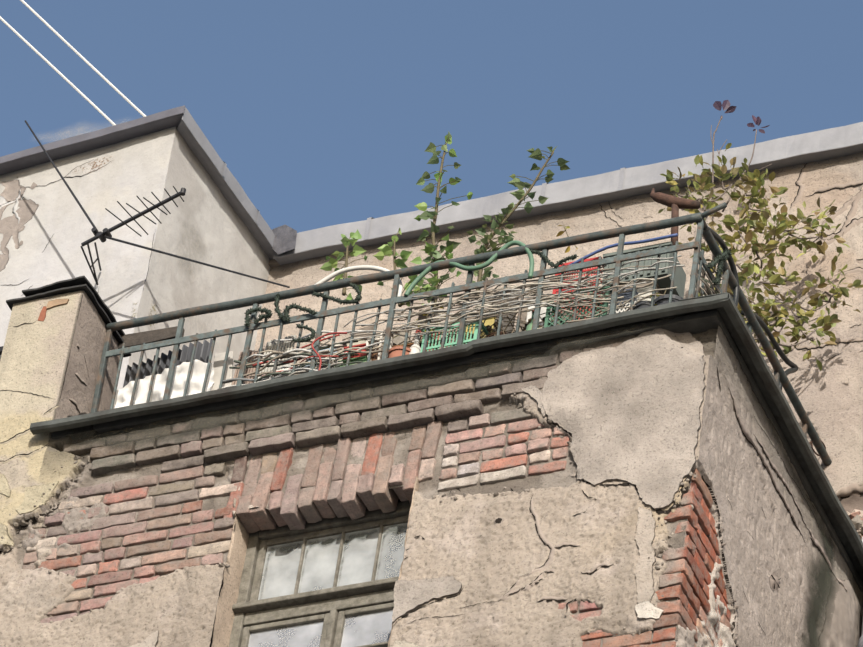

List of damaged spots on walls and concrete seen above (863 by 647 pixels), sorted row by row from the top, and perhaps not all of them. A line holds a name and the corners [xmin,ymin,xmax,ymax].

peeling [0,177,39,272]
crack [790,162,863,253]
flaking render [38,299,69,321]
crack [0,344,88,464]
crack [0,504,59,554]
flaking render [0,446,240,623]
flaking render [392,576,462,623]
crack [394,489,595,625]
flaking render [432,328,739,647]
crack [717,368,848,594]
damp [802,532,834,647]
flaking render [837,492,863,540]